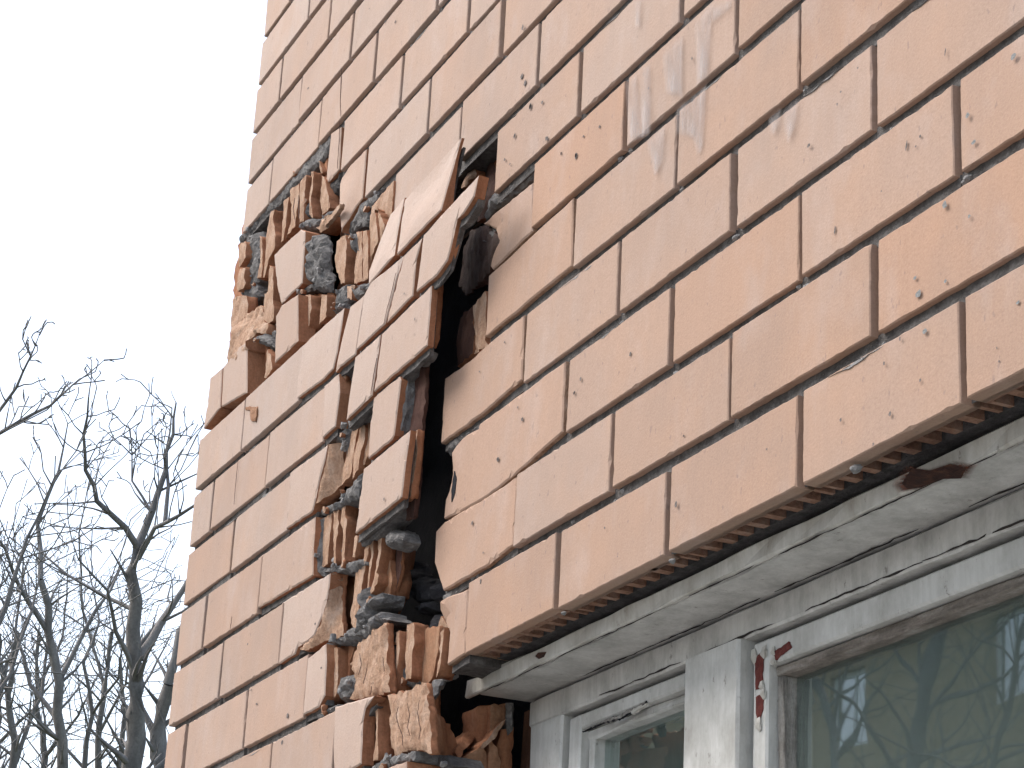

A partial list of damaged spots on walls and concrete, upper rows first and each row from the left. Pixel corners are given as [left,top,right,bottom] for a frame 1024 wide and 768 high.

spalling [204,127,396,430]
crack [324,234,340,290]
crack [400,153,666,768]
crack [778,479,942,555]
corrosion [896,462,972,491]
crack [969,483,1024,507]
spalling [300,415,514,768]
crack [581,530,917,732]
crack [806,519,1024,611]